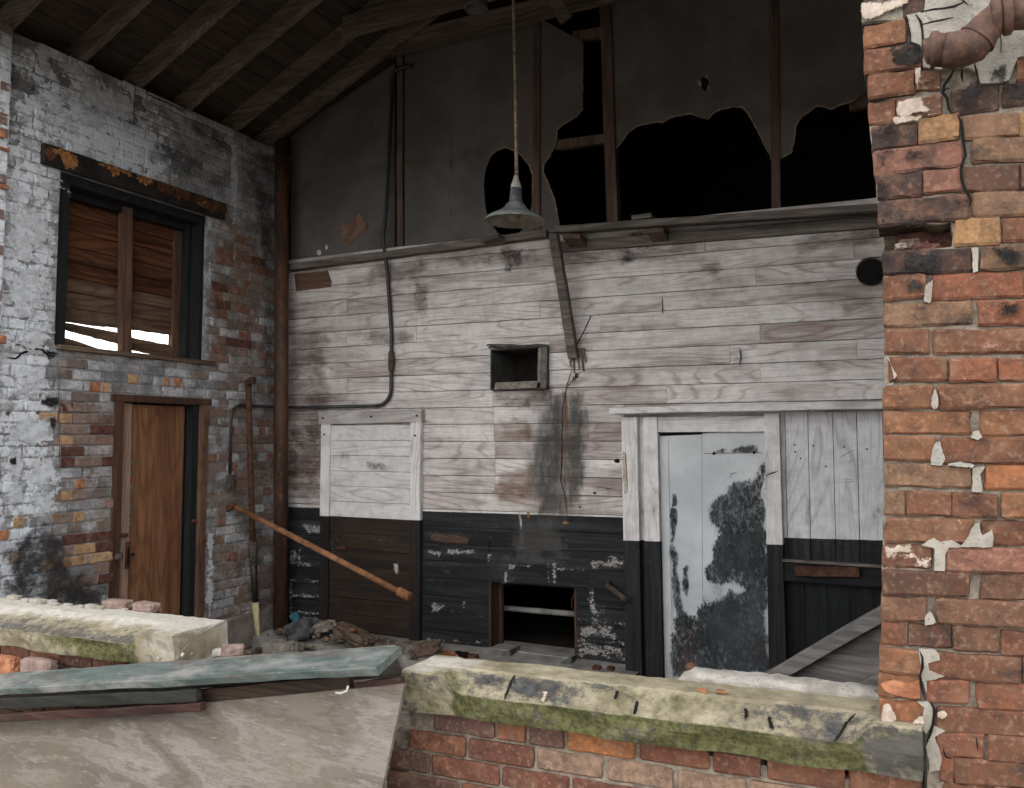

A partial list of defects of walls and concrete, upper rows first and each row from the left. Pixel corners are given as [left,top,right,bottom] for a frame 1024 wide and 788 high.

corrosion [45,146,78,170]
corrosion [99,163,227,214]
spalling [617,106,769,154]
crack [941,63,979,207]
damp [532,400,580,509]
peeling [547,556,625,661]
peeling [669,463,769,676]
spalling [885,544,931,567]
spalling [881,679,920,722]
crack [919,651,952,759]